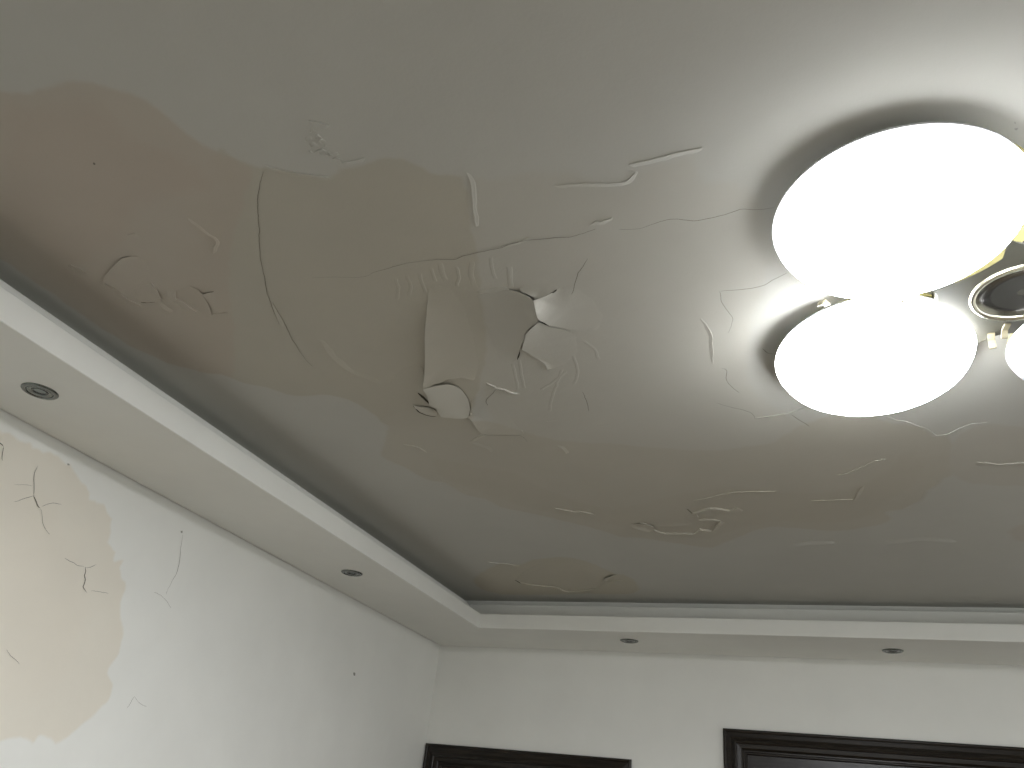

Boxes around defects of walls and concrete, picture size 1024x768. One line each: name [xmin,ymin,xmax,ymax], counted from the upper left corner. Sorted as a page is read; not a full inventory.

crack [257,174,312,366]
peeling [319,285,524,452]
water stain [0,77,1024,548]
crack [351,208,769,278]
water stain [0,429,128,747]
water stain [471,556,641,595]